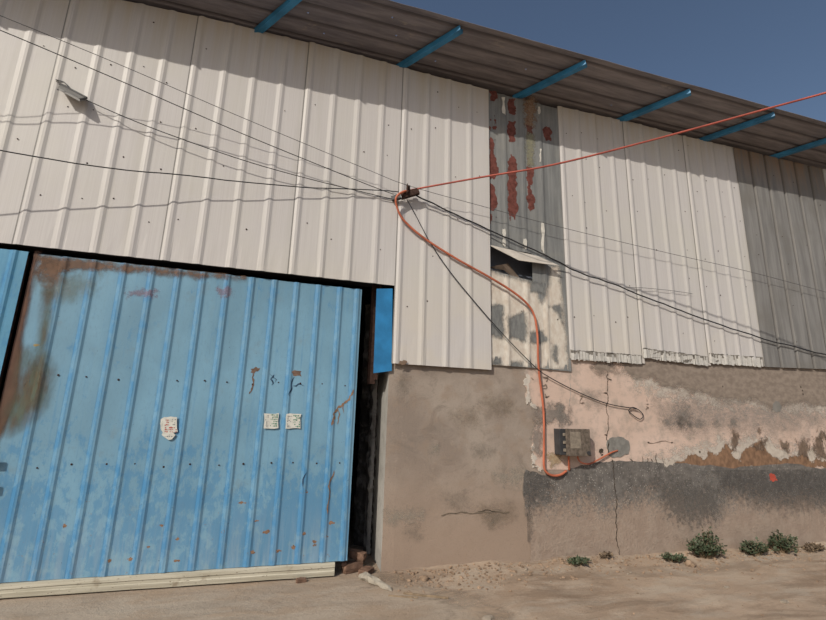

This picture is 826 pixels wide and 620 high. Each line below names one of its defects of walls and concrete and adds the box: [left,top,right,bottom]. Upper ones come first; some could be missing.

rust [489,119,535,224]
rust [507,95,552,142]
rust [0,251,227,436]
peeling [490,266,826,472]
crack [441,509,509,517]
crack [604,374,664,555]